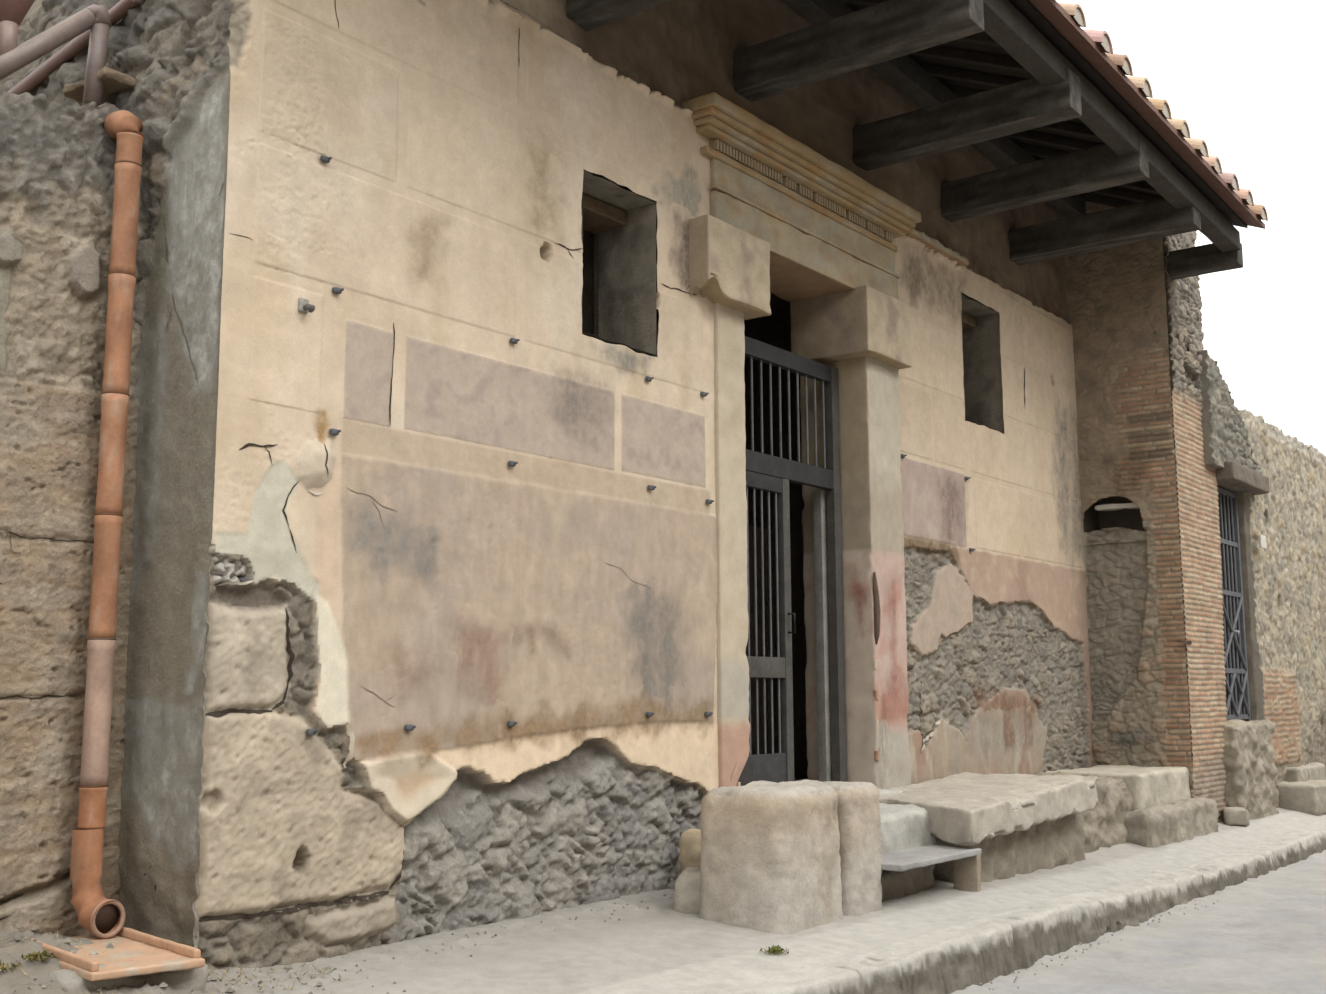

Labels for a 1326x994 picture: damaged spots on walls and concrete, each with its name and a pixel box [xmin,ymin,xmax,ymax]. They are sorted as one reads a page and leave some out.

crack [239,443,278,463]
crack [282,481,299,553]
crack [347,487,396,528]
spalling [198,544,385,835]
spalling [904,546,1091,773]
spalling [192,737,708,970]